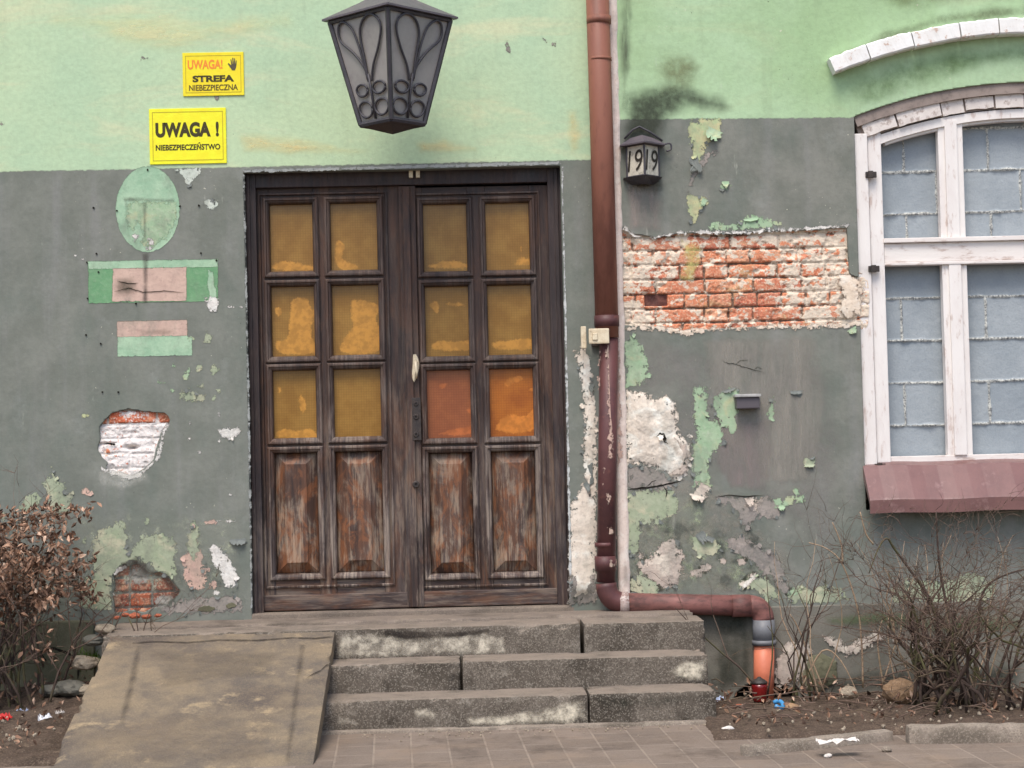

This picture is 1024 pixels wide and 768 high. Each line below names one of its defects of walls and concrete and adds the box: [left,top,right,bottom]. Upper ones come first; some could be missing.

crack [118,281,174,293]
flaking render [622,117,869,389]
peeling [18,465,94,515]
spalling [98,409,170,480]
peeling [567,345,614,607]
peeling [627,385,849,605]
peeling [79,518,247,617]
water stain [340,630,504,656]